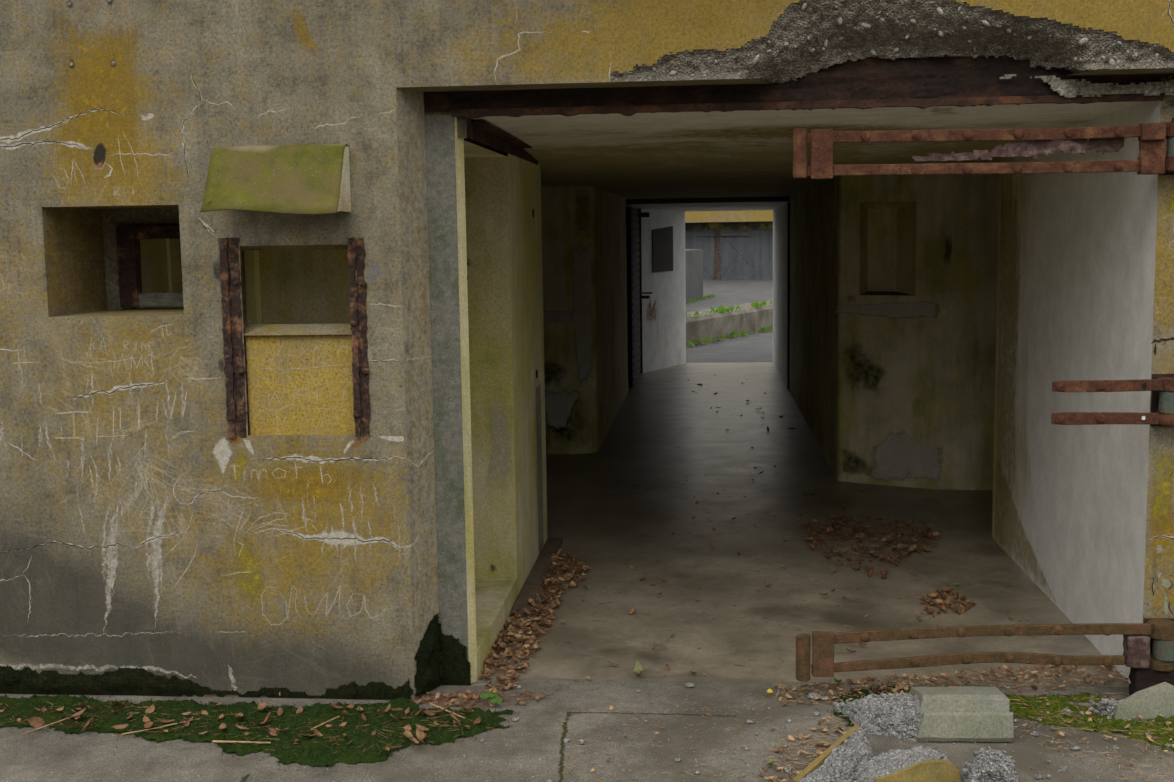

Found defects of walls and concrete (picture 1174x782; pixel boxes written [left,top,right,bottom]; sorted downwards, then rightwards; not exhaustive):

spalling [610,0,1174,83]
crack [0,67,289,188]
crack [312,110,393,129]
corrosion [913,138,1125,162]
crack [197,216,219,238]
flaking render [545,390,579,429]
crack [252,450,434,468]
crack [173,476,257,510]
crack [267,528,419,549]
crack [0,532,185,618]